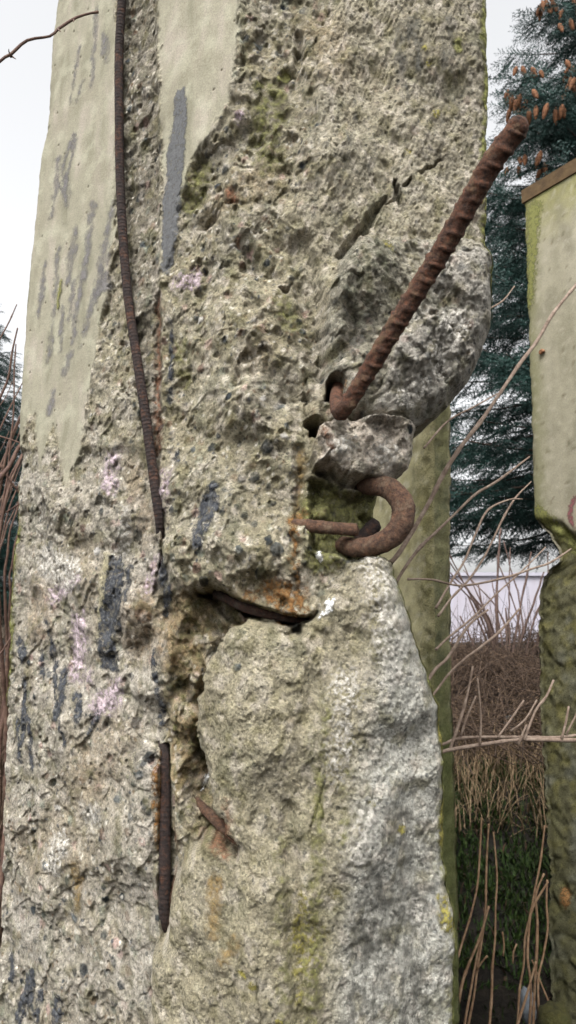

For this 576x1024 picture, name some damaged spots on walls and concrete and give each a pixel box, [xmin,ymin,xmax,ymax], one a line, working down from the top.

spalling [329,115,529,421]
spalling [0,0,381,1024]
corrosion [243,451,323,625]
corrosion [151,751,162,848]